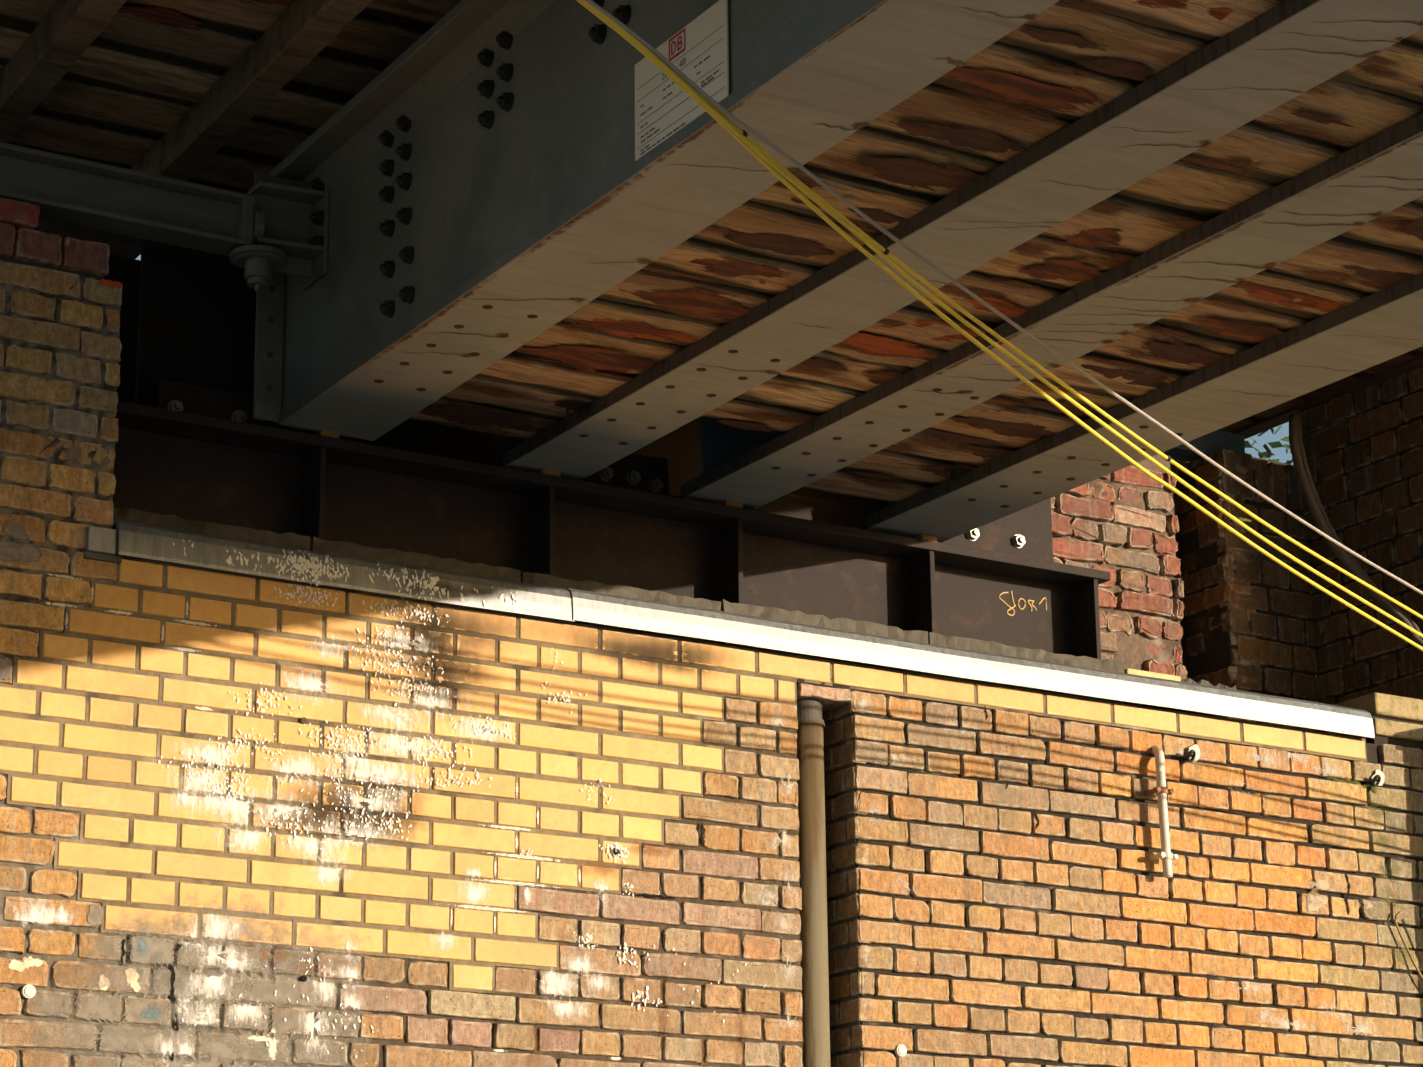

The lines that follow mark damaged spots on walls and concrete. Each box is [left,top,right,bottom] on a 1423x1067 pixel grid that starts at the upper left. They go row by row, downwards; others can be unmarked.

water stain [226,549,349,607]
water stain [542,648,587,714]
water stain [158,562,518,883]
water stain [439,811,560,949]
water stain [578,869,634,901]
water stain [599,842,629,863]
water stain [178,915,378,1061]
water stain [542,932,602,1015]
water stain [617,942,655,965]
water stain [631,986,668,1016]
efflorescence [162,1043,190,1057]